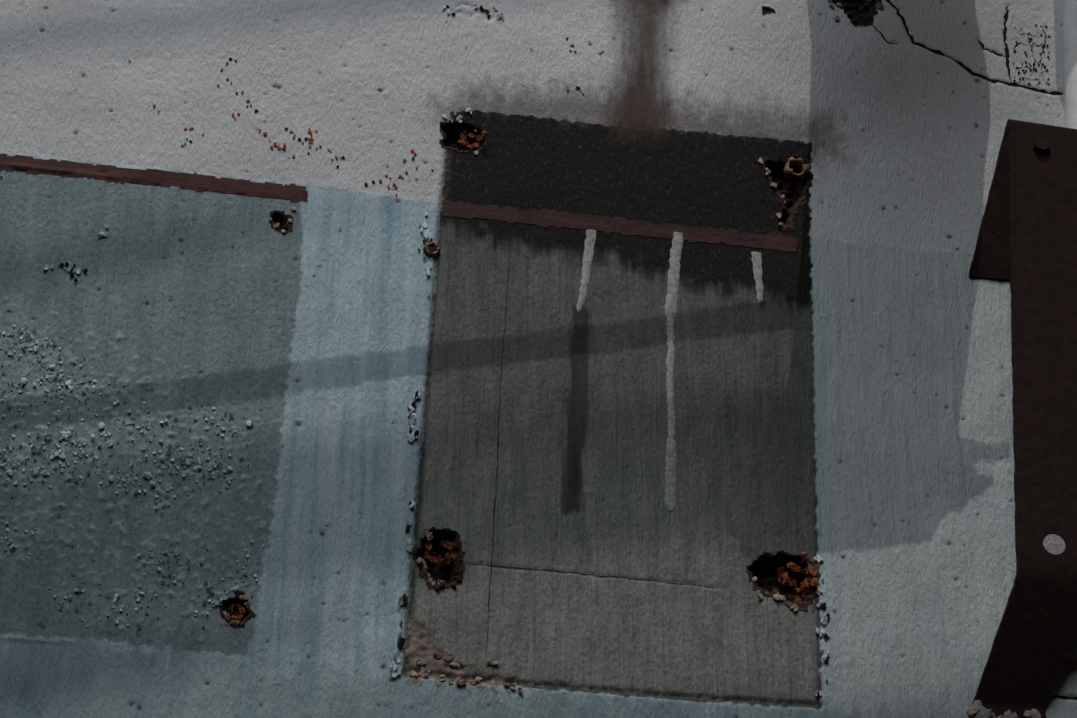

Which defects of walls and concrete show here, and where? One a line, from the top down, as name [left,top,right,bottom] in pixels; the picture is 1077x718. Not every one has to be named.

peeling [474,4,504,20]
rust [612,0,667,137]
crack [867,0,1063,95]
peeling [442,108,489,156]
peeling [758,157,786,227]
peeling [418,212,433,251]
peeling [407,390,421,443]
water stain [563,307,588,513]
peeling [406,499,464,590]
peeling [752,552,830,662]
peeling [390,616,523,693]